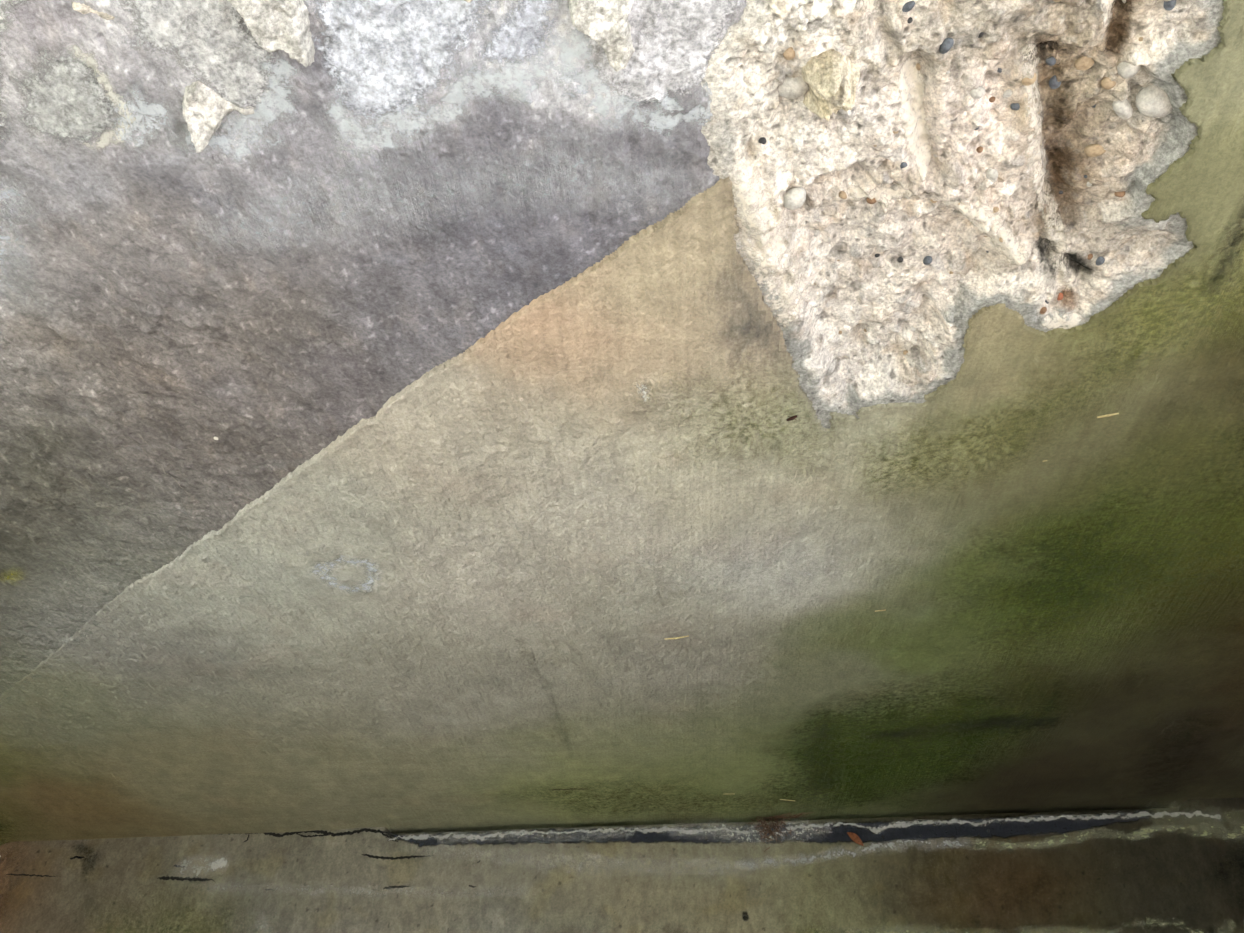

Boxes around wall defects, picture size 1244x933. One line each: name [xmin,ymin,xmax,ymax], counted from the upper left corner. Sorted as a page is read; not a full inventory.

peeling [0,0,1224,708]
water stain [1118,812,1244,840]
water stain [739,827,1099,869]